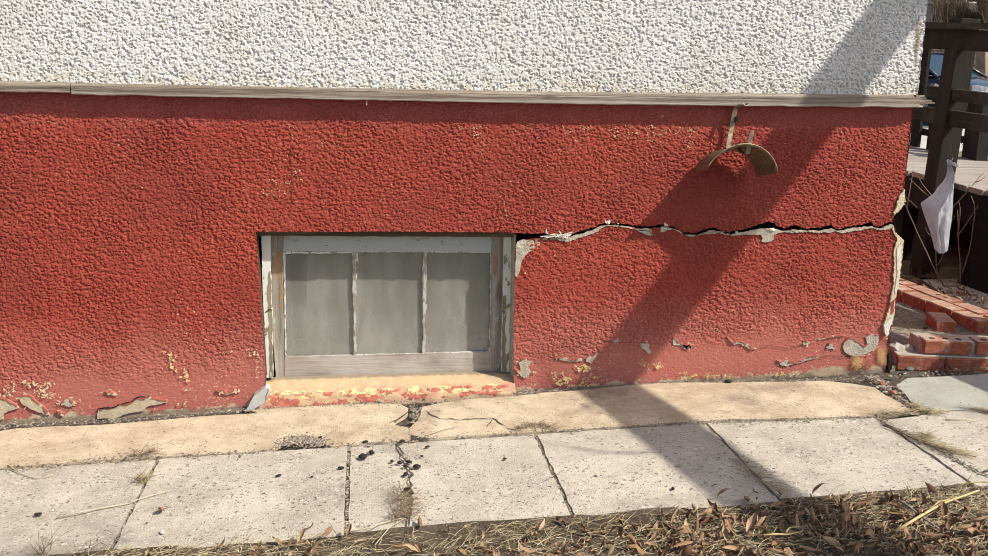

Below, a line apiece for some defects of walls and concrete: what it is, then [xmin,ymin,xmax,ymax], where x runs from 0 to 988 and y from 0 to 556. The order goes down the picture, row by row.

crack [539,220,893,242]
spalling [775,189,906,377]
peeling [0,380,81,420]
peeling [97,351,196,419]
peeling [265,383,508,409]
peeling [515,357,537,378]
peeling [551,352,601,387]
peeling [640,341,664,370]
peeling [672,336,696,354]
crack [389,411,505,526]